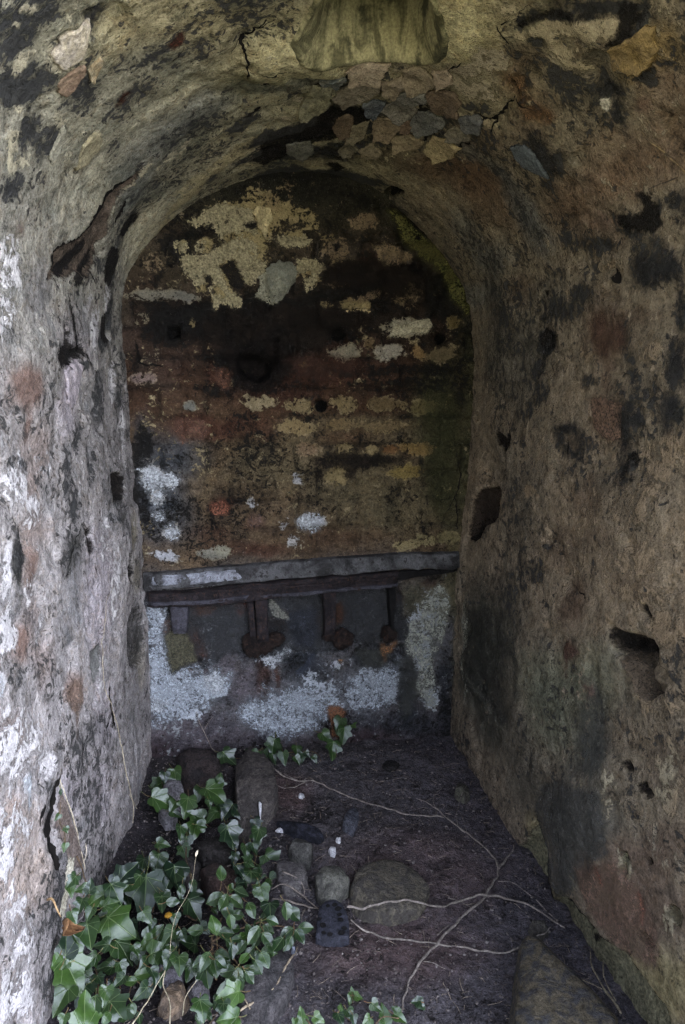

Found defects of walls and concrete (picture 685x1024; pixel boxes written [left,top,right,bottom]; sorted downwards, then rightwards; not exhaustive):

crack [231,20,348,94]
crack [455,96,539,154]
spalling [46,171,139,287]
peeling [173,200,379,310]
peeling [380,243,413,265]
peeling [388,318,432,337]
water stain [139,468,180,540]
spalling [469,487,502,542]
water stain [146,608,232,727]
water stain [239,585,450,738]
spalling [609,626,665,700]
crack [40,687,116,918]